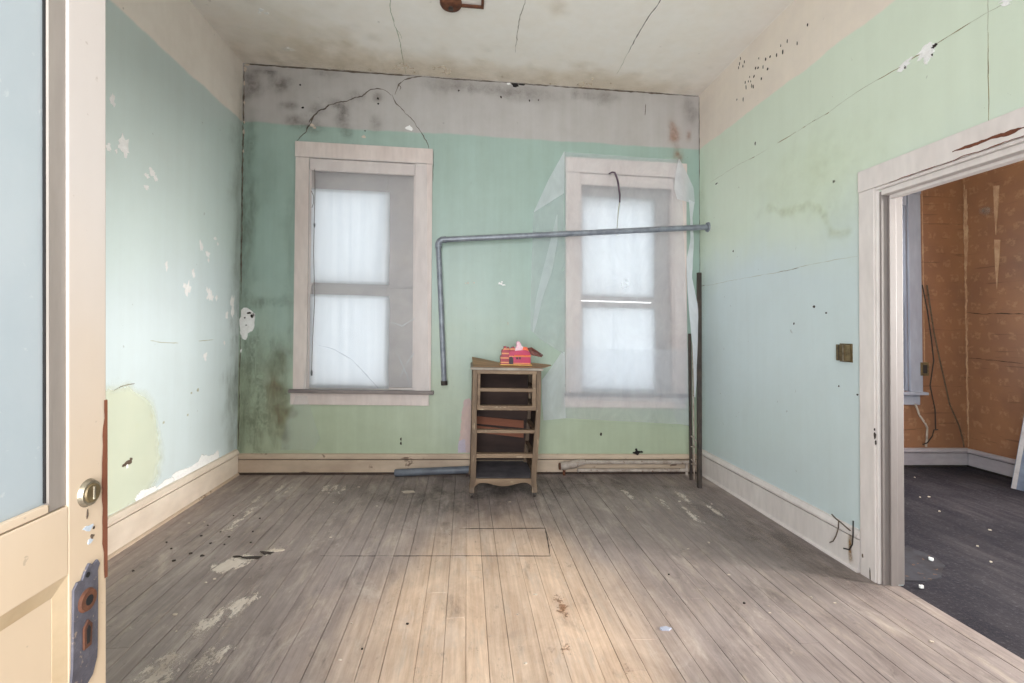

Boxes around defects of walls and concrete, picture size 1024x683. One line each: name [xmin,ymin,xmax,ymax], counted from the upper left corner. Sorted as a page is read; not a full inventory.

flaking render [896,42,937,72]
crack [240,0,1001,282]
peeling [206,287,255,353]
crack [235,337,243,446]
peeling [175,450,219,480]